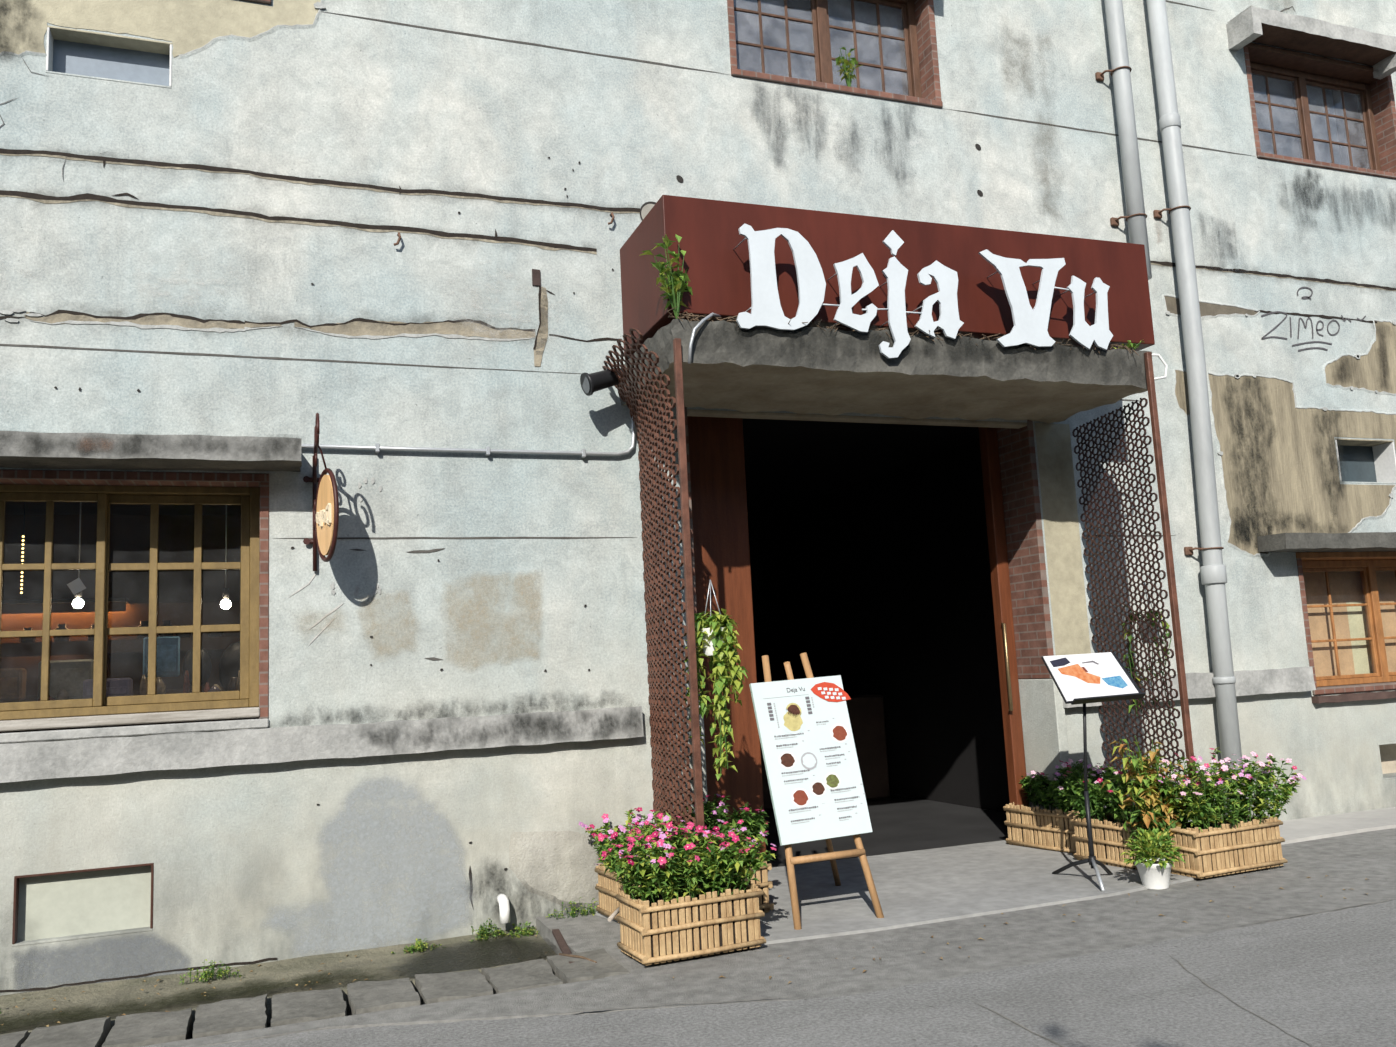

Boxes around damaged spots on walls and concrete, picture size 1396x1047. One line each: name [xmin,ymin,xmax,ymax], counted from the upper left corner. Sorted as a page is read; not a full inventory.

damp [0,1,10,56]
peeling [0,0,326,59]
crack [0,56,640,366]
peeling [1173,368,1190,418]
peeling [1206,319,1396,557]
damp [481,703,563,738]